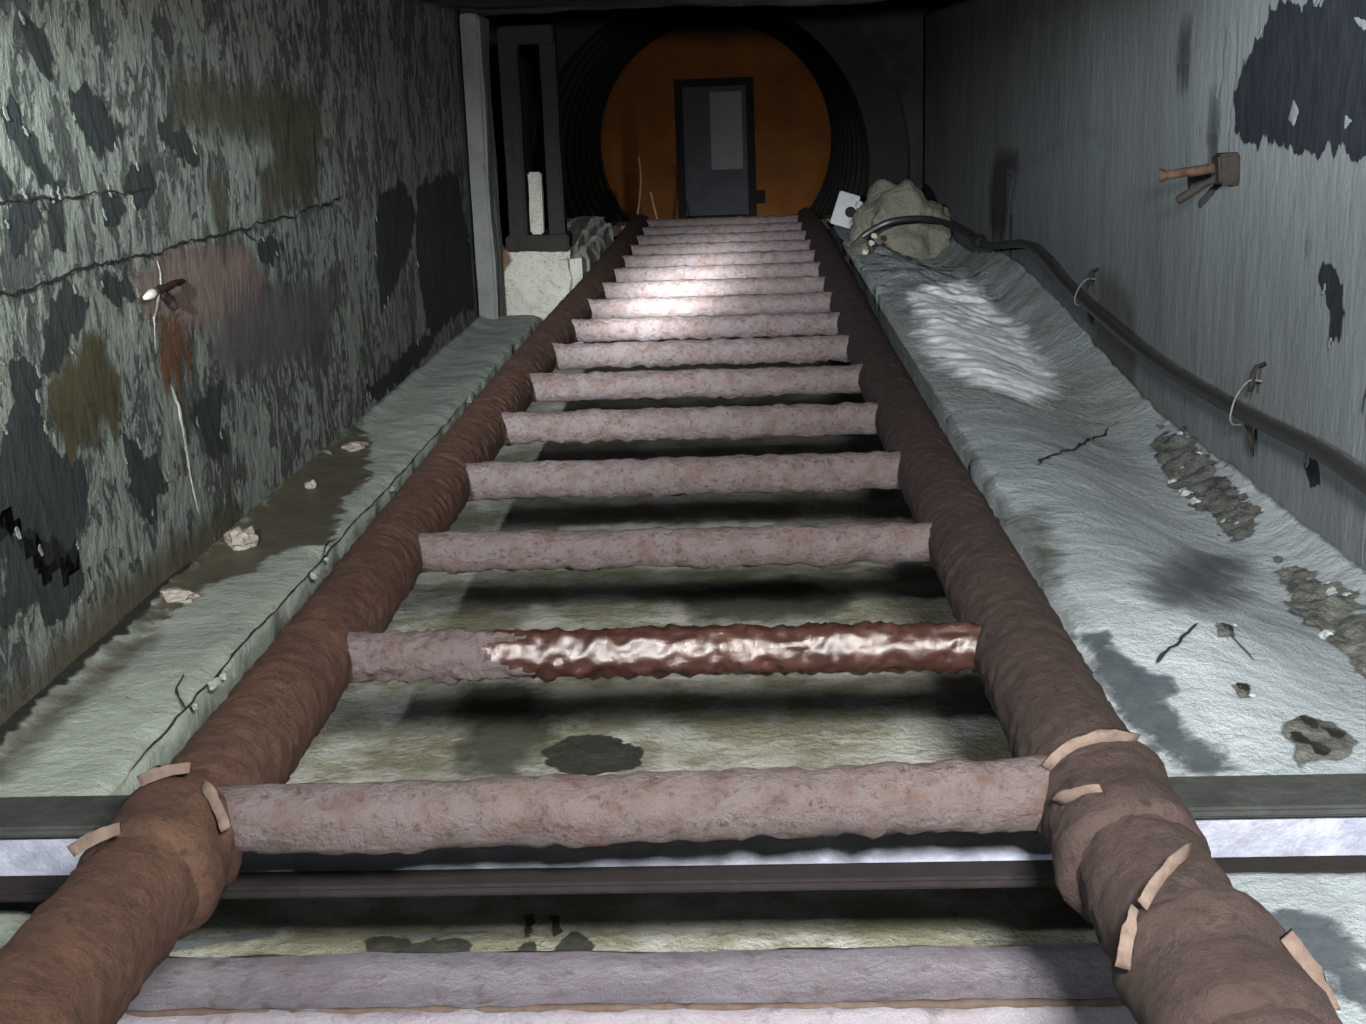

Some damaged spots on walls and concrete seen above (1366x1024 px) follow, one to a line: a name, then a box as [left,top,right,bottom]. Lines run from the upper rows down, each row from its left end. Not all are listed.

peeling [1233,0,1366,163]
crack [0,133,342,297]
peeling [1318,262,1345,349]
spalling [1150,425,1263,541]
spalling [1272,556,1366,679]
spalling [1281,714,1357,767]